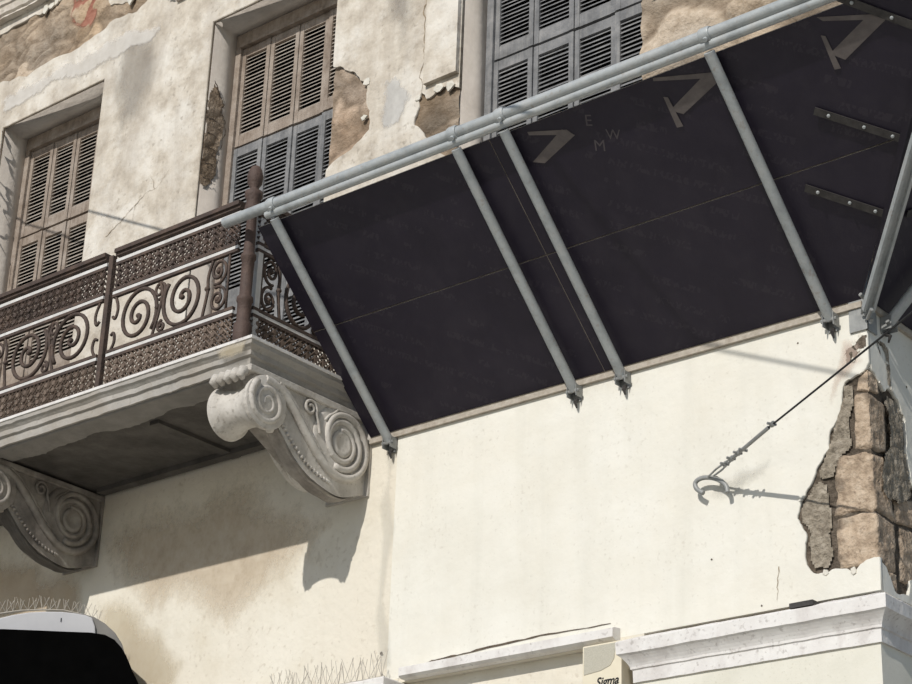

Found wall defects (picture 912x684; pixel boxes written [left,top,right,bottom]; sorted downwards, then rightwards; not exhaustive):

spalling [0,0,160,111]
spalling [199,81,226,187]
spalling [328,68,370,167]
spalling [383,77,461,138]
spalling [846,333,867,363]
spalling [798,341,912,595]